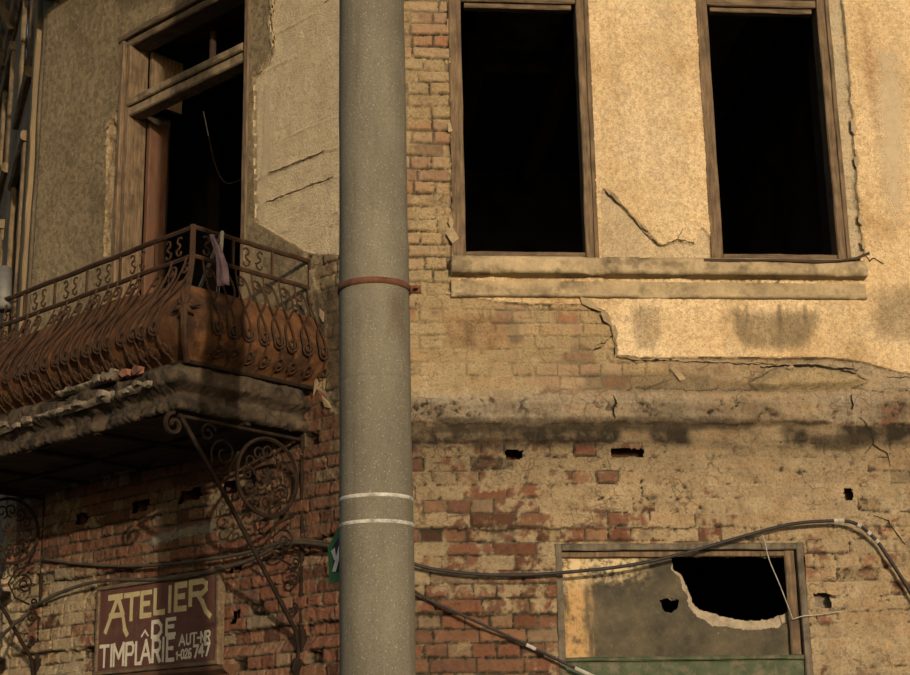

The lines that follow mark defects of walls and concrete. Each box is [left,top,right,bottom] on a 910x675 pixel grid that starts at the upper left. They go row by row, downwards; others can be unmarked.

flaking render [404,0,686,399]
peeling [600,189,711,258]
crack [592,308,891,467]
spalling [0,365,153,435]
damp [435,419,527,431]
damp [538,418,767,430]
damp [815,434,868,450]
spalling [505,449,524,460]
spalling [611,448,644,458]